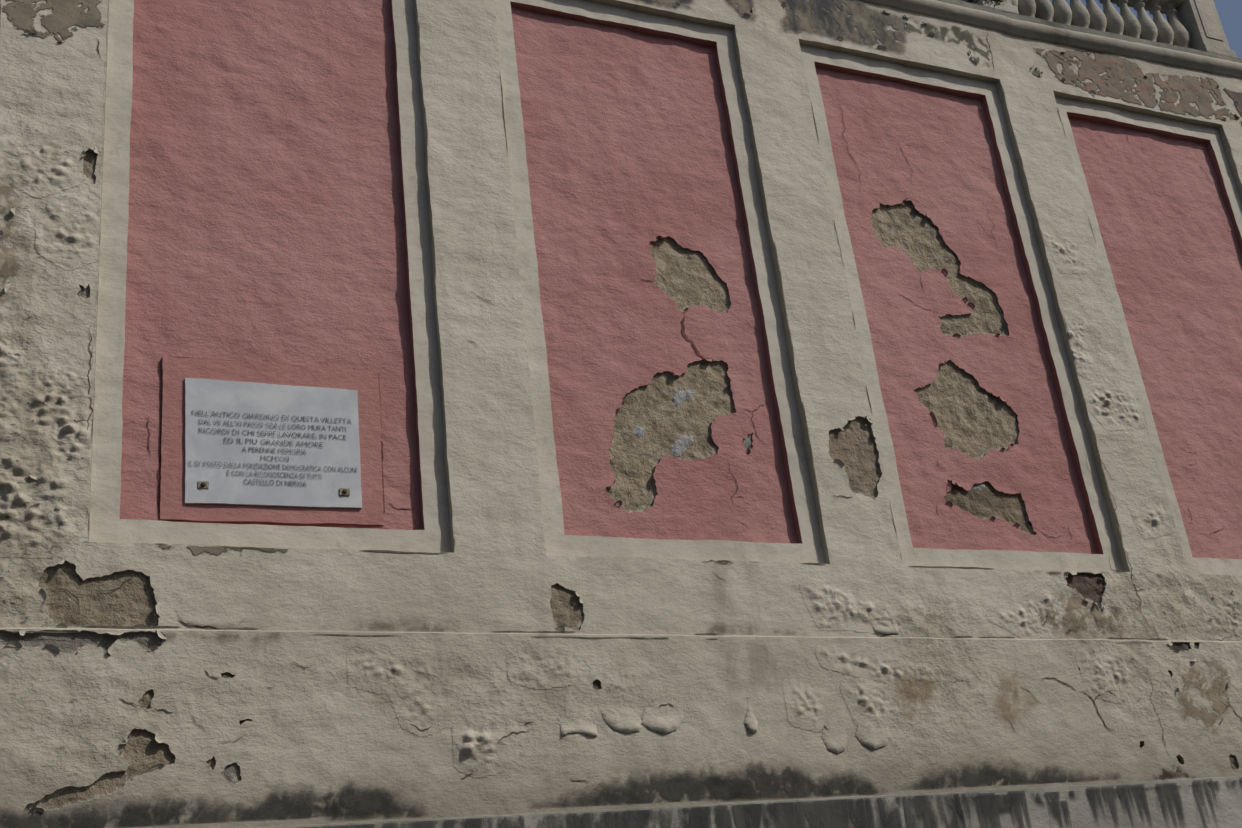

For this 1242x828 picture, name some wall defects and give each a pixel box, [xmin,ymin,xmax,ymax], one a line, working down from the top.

peeling [1030,48,1242,125]
spalling [871,198,1009,337]
crack [681,314,715,360]
spalling [606,358,736,514]
spalling [828,416,882,500]
spalling [913,359,1020,459]
spalling [944,480,1037,535]
spalling [0,560,167,656]
spalling [550,583,585,631]
crack [1021,677,1116,732]
spalling [26,728,176,814]
damp [0,765,1242,828]